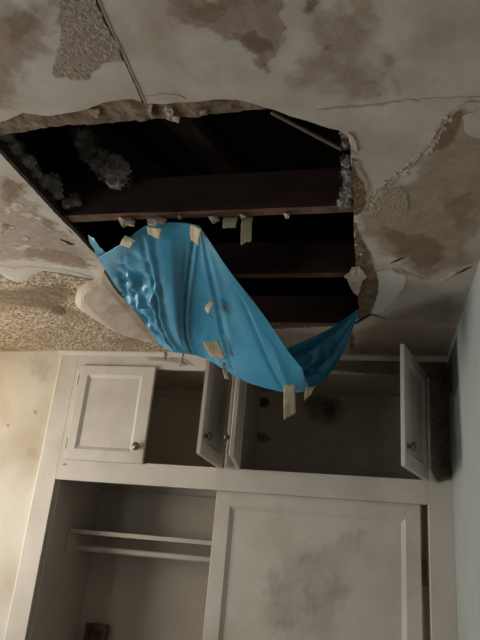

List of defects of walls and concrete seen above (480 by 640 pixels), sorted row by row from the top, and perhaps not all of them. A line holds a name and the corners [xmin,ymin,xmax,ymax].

flaking render [52,0,124,81]
leakage [167,0,286,68]
peeling [163,105,180,123]
crack [316,96,480,112]
peeling [348,101,480,215]
leakage [363,112,480,275]
leakage [26,249,91,268]
flaking render [0,265,170,352]
peeling [344,266,367,296]
leakage [333,302,451,375]
leakage [418,339,458,482]